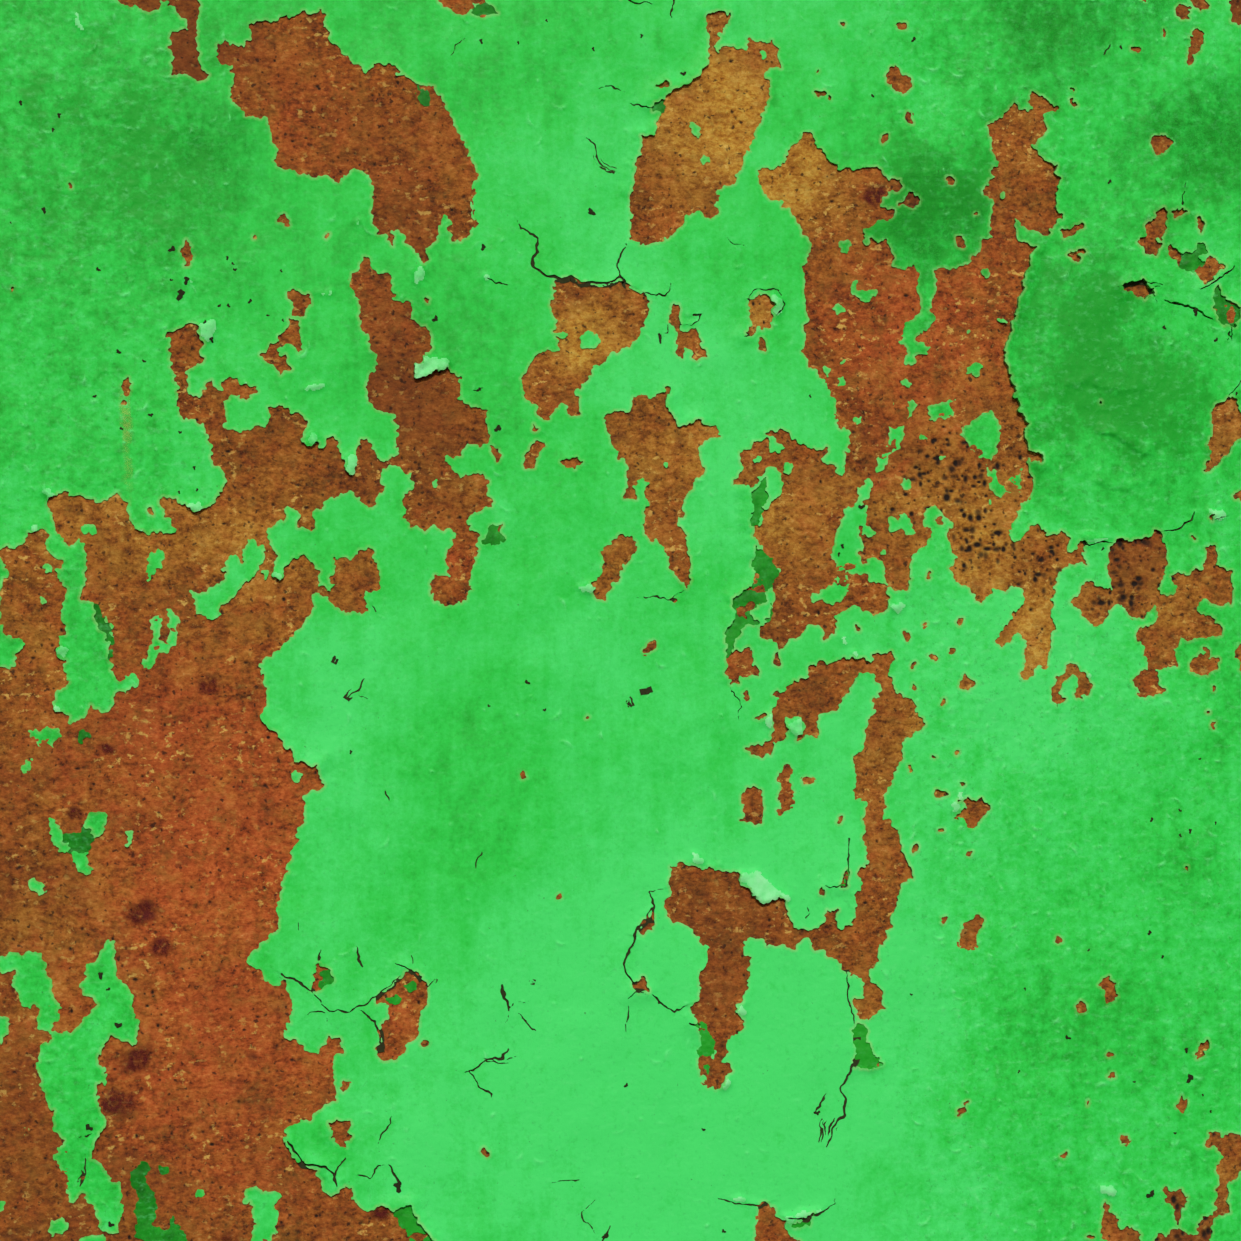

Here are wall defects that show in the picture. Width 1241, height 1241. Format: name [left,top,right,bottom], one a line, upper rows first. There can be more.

corrosion [118,0,209,81]
corrosion [438,0,498,18]
corrosion [216,9,479,284]
corrosion [629,11,781,245]
crack [488,221,702,344]
crack [1122,267,1234,340]
corrosion [640,88,1241,1090]
corrosion [0,257,506,1241]
crack [281,923,438,1053]
crack [623,889,701,1031]
crack [815,969,861,1147]
crack [284,1116,401,1187]